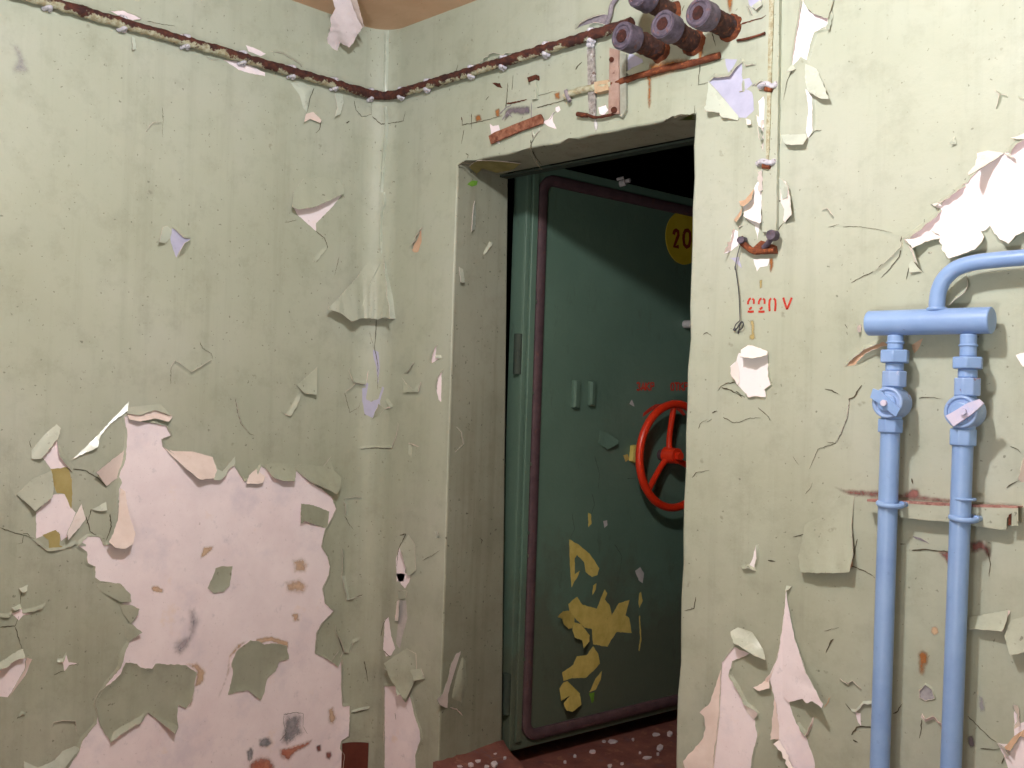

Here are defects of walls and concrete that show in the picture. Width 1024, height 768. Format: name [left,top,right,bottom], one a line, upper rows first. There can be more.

rust [647,60,685,105]
peeling [673,57,765,150]
peeling [781,0,834,145]
peeling [328,251,391,321]
crack [846,226,924,283]
peeling [903,133,1024,273]
peeling [730,345,773,401]
crack [793,385,862,493]
rust [898,489,950,502]
peeling [16,402,352,768]
peeling [381,534,425,768]
peeling [683,586,830,768]